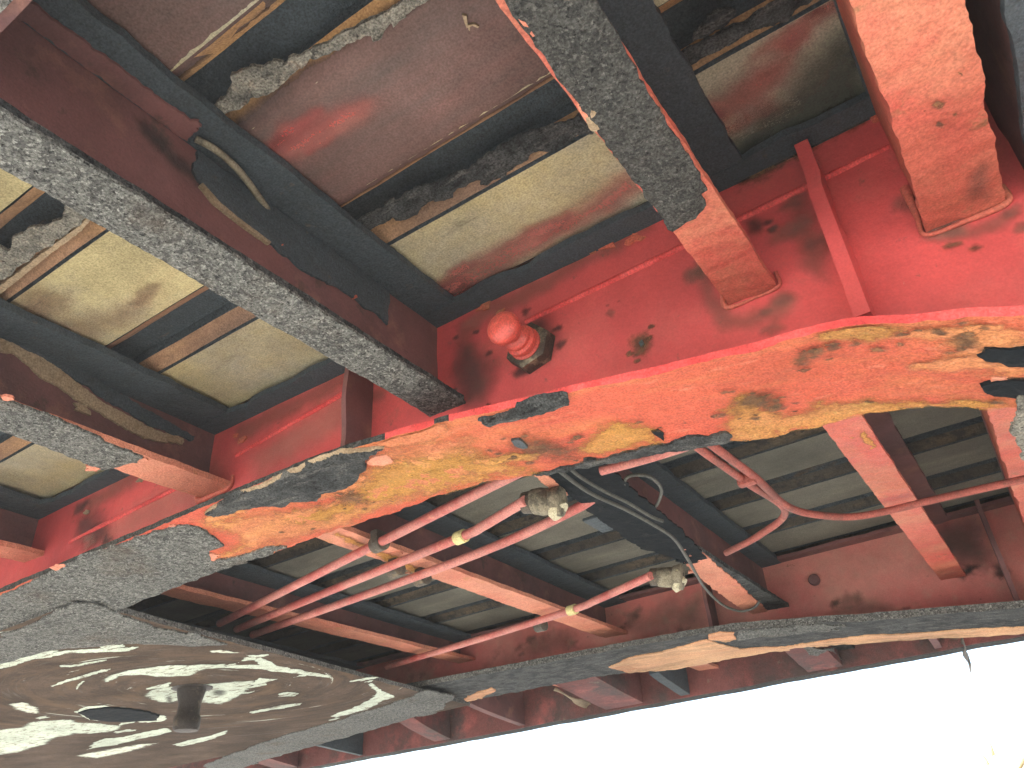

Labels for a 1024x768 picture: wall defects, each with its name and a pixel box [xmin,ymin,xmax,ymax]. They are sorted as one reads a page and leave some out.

peeling [226,58,284,94]
peeling [578,110,599,135]
peeling [141,123,390,325]
rust [0,106,1024,664]
peeling [205,445,393,517]
peeling [609,626,1024,673]